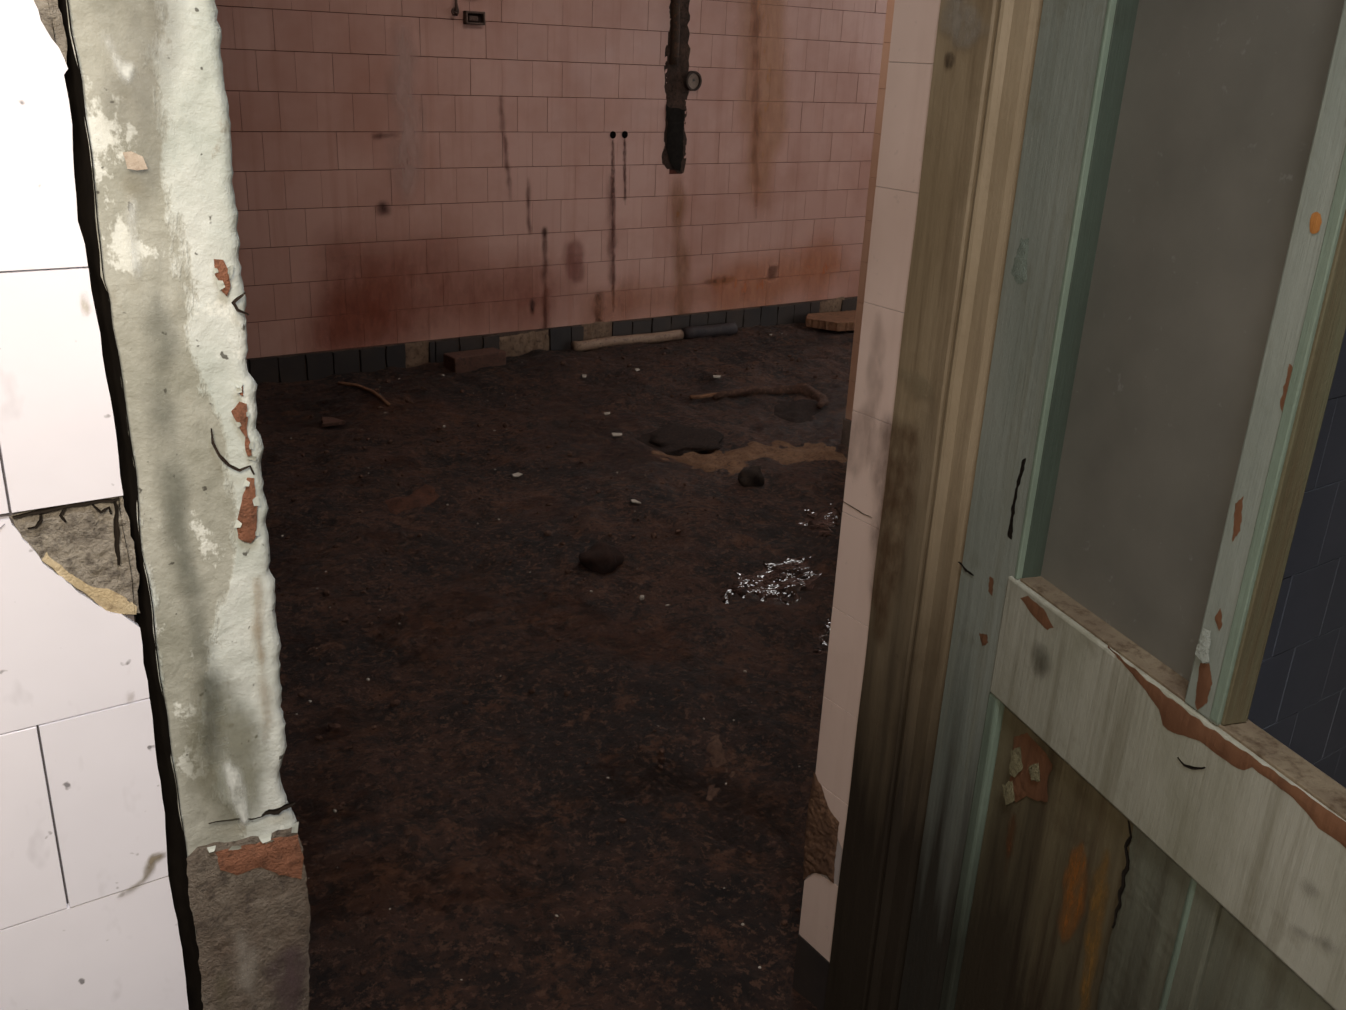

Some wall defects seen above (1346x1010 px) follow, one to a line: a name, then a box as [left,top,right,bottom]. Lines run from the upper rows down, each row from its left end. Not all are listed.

peeling [213,259,233,296]
damp [595,140,626,322]
peeling [231,380,257,461]
spalling [9,496,140,615]
crack [48,0,295,1010]
peeling [234,478,260,543]
peeling [1002,747,1040,805]
peeling [1108,609,1346,848]
flaking render [186,821,311,1010]
crack [1111,821,1132,928]